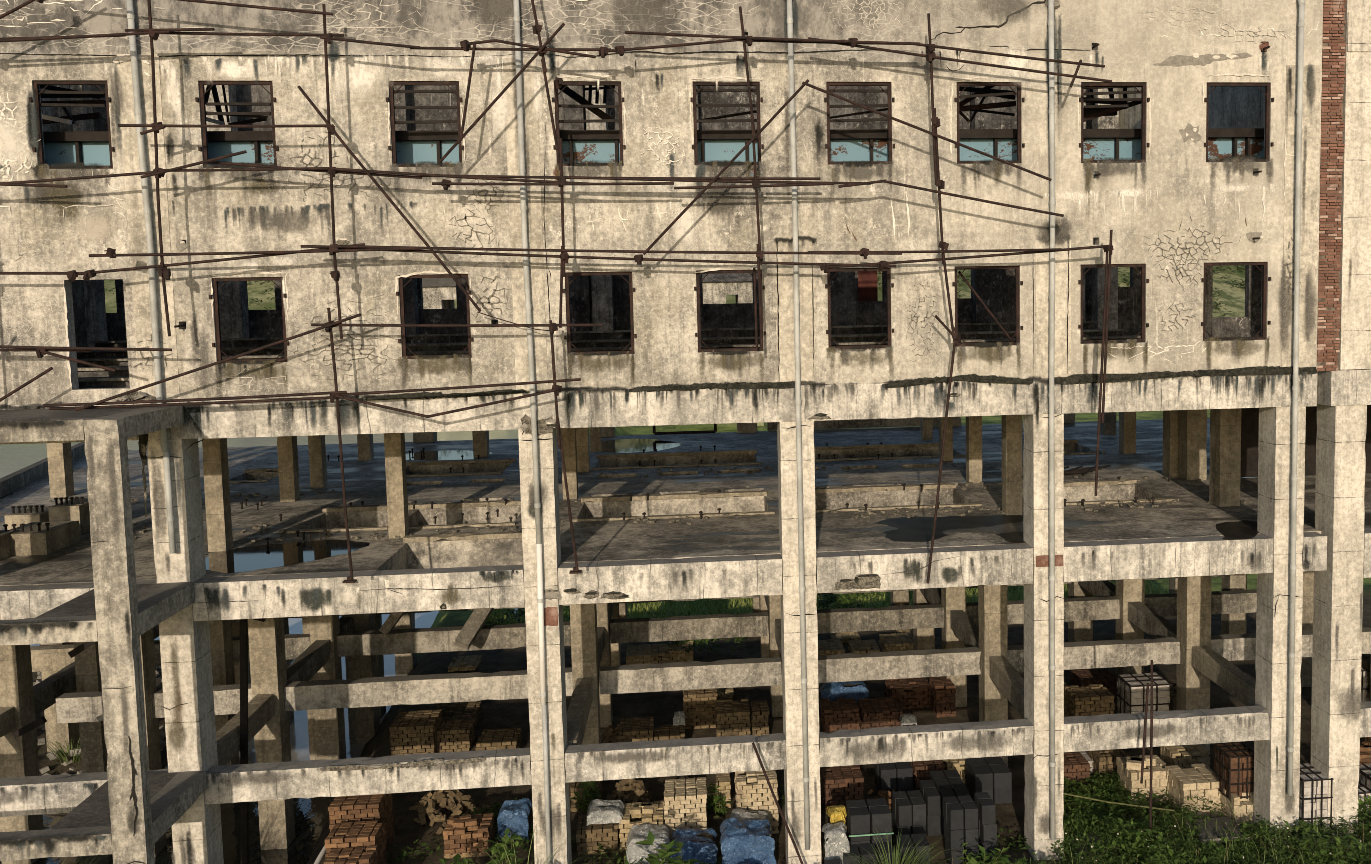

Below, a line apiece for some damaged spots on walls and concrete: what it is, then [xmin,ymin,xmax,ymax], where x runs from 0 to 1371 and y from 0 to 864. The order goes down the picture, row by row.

crack [0,0,1093,86]
leakage [224,204,330,231]
crack [444,172,510,332]
crack [543,165,551,319]
crack [1067,134,1296,374]
crack [1029,266,1037,332]
leakage [204,586,246,608]
leakage [263,585,360,610]
leakage [480,570,518,582]
leakage [904,559,922,580]
leakage [942,556,998,582]
crack [127,736,145,864]